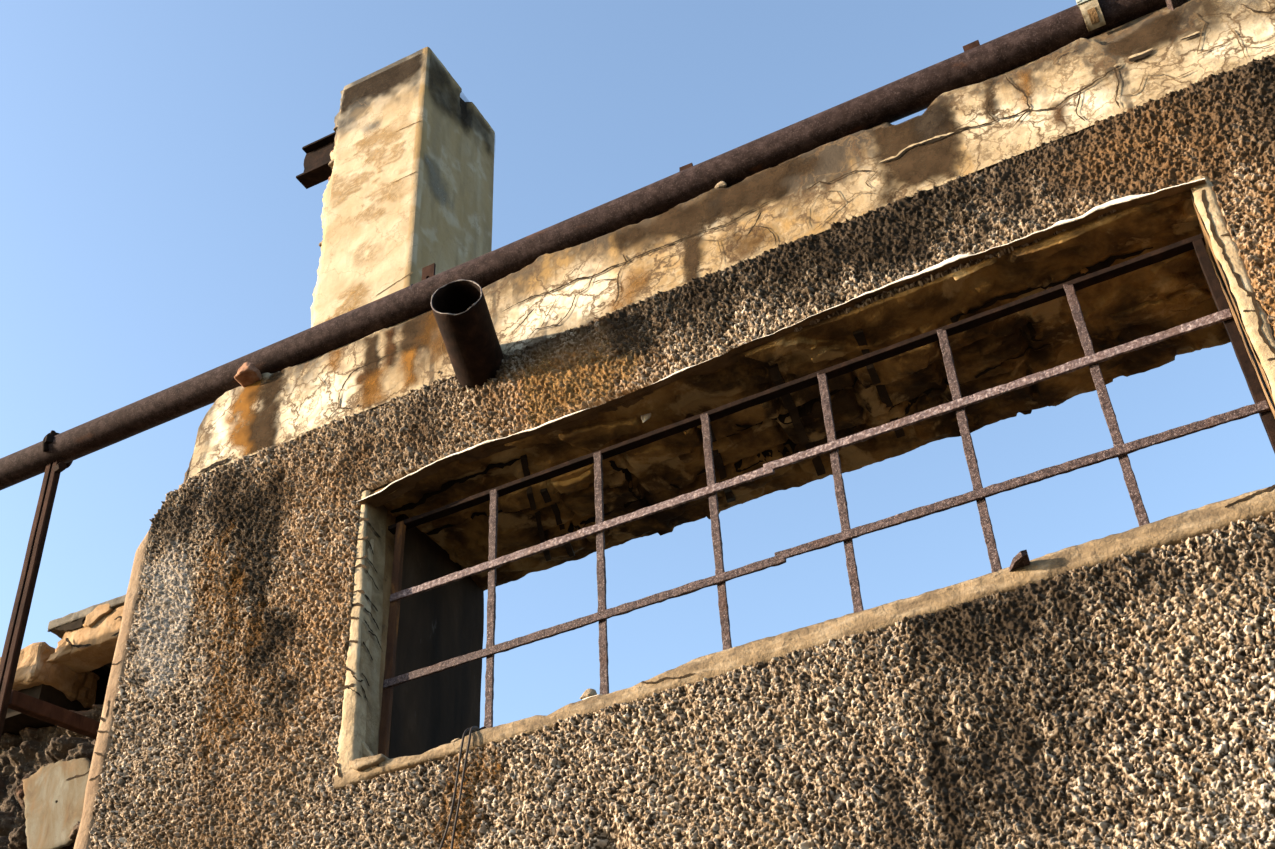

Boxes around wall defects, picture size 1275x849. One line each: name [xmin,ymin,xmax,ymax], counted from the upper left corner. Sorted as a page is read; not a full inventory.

water stain [615,157,816,283]
crack [502,4,1275,360]
water stain [872,102,962,201]
water stain [984,79,995,116]
water stain [1053,104,1062,124]
rust [226,378,264,455]
crack [318,349,402,420]
rust [356,310,445,409]
crack [197,456,228,474]
water stain [222,475,290,679]
peeling [47,603,113,632]